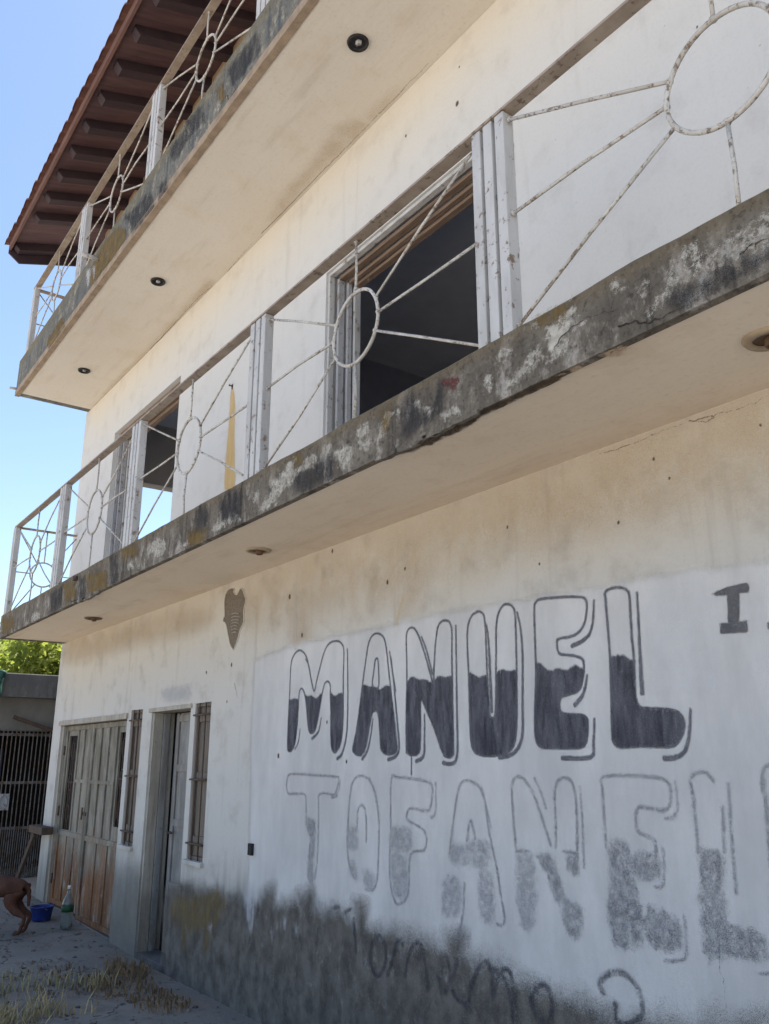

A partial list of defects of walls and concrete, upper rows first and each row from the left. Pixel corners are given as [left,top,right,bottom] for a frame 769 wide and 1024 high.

damp [227,29,261,87]
damp [167,108,206,161]
damp [125,178,168,232]
peeling [609,211,769,318]
peeling [496,294,587,387]
damp [397,376,446,445]
peeling [414,385,461,422]
damp [292,449,336,494]
damp [194,488,243,528]
damp [104,848,769,1024]